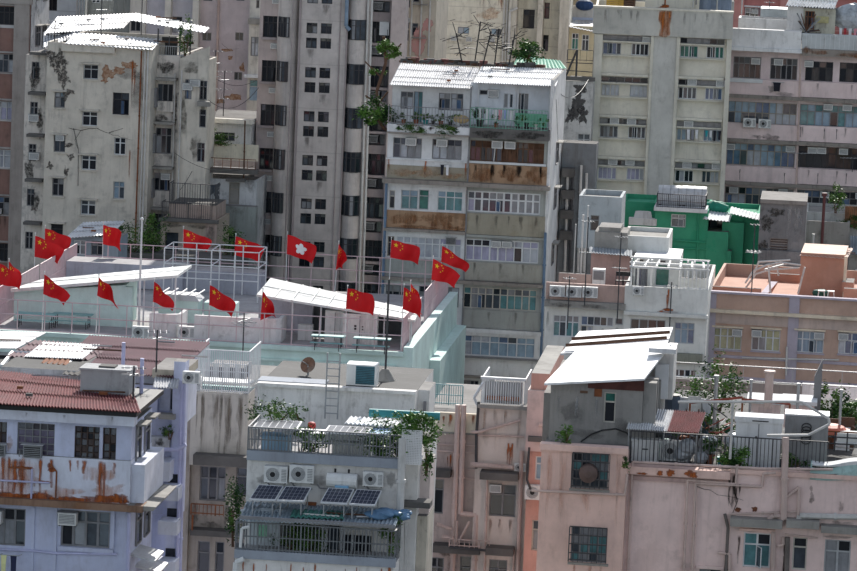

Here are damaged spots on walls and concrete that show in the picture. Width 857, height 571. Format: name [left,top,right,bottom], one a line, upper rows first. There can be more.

corrosion [657,0,671,37]
spalling [46,49,74,101]
spalling [101,61,138,83]
spalling [565,84,588,124]
corrosion [0,458,129,504]
corrosion [637,469,698,478]